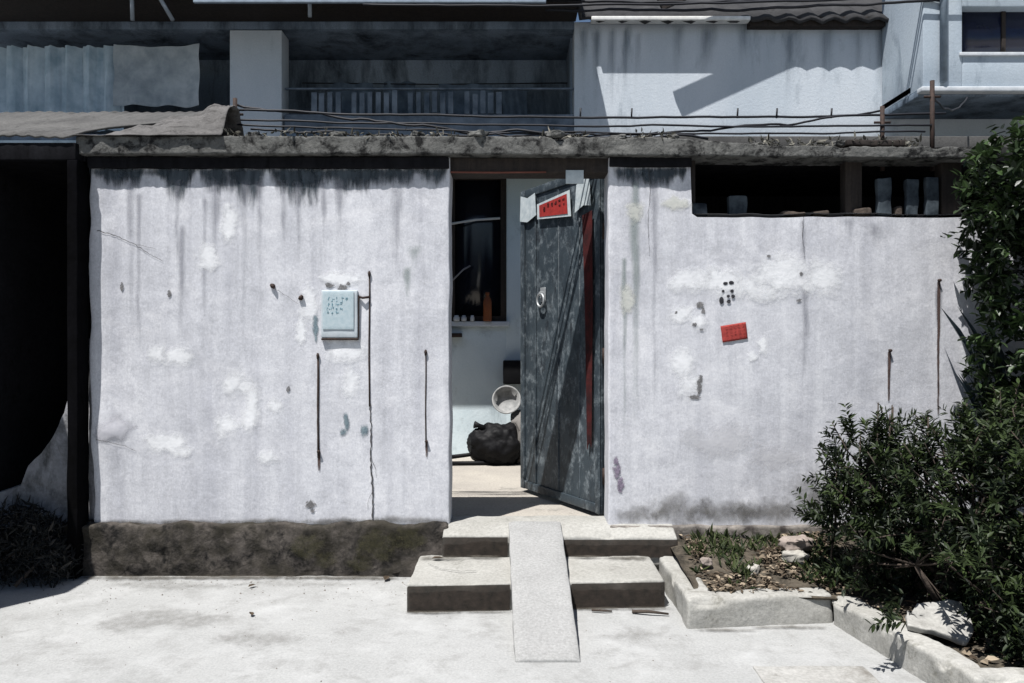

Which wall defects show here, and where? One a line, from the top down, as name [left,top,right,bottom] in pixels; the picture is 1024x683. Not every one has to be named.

damp [94,168,445,200]
damp [616,168,686,291]
peeling [669,253,842,331]
crack [368,403,376,521]